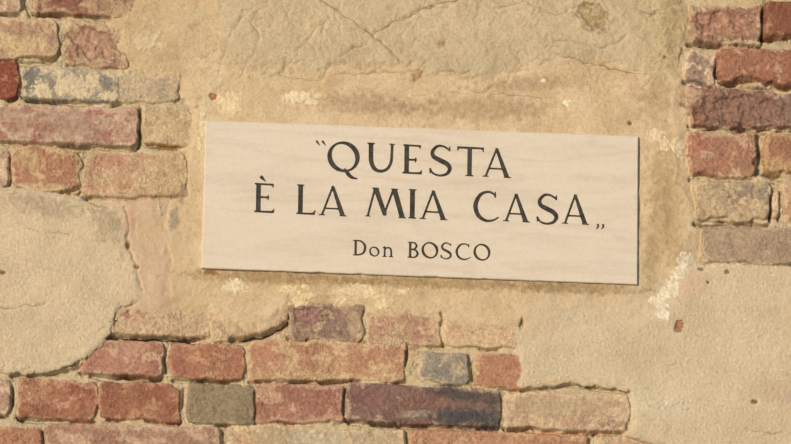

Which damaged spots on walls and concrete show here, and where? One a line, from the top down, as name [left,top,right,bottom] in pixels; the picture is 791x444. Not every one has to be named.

peeling [30,27,127,105]
crack [219,0,268,76]
crack [272,0,550,99]
crack [546,35,661,77]
peeling [0,186,121,215]
peeling [278,283,409,325]
peeling [0,310,117,376]
peeling [516,375,628,392]